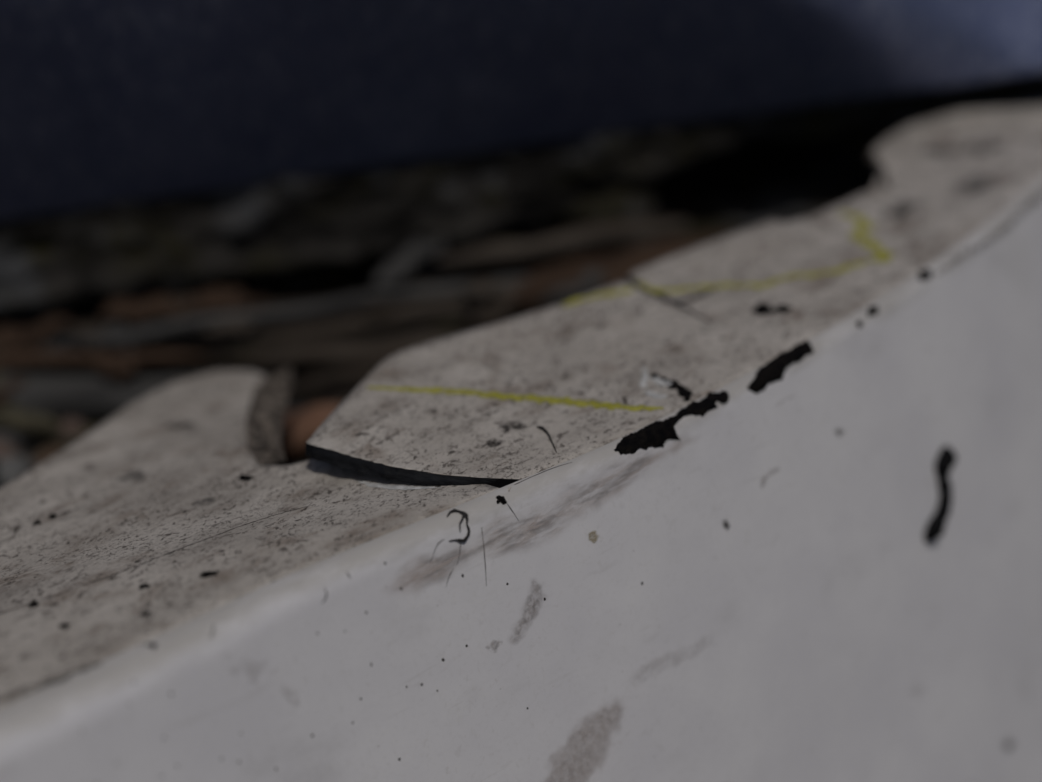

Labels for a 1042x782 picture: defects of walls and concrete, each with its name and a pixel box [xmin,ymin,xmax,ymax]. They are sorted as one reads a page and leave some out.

peeling [917,269,933,282]
peeling [752,302,792,315]
peeling [856,305,879,328]
peeling [747,339,814,394]
spalling [246,368,292,465]
peeling [614,367,731,455]
crack [305,443,572,490]